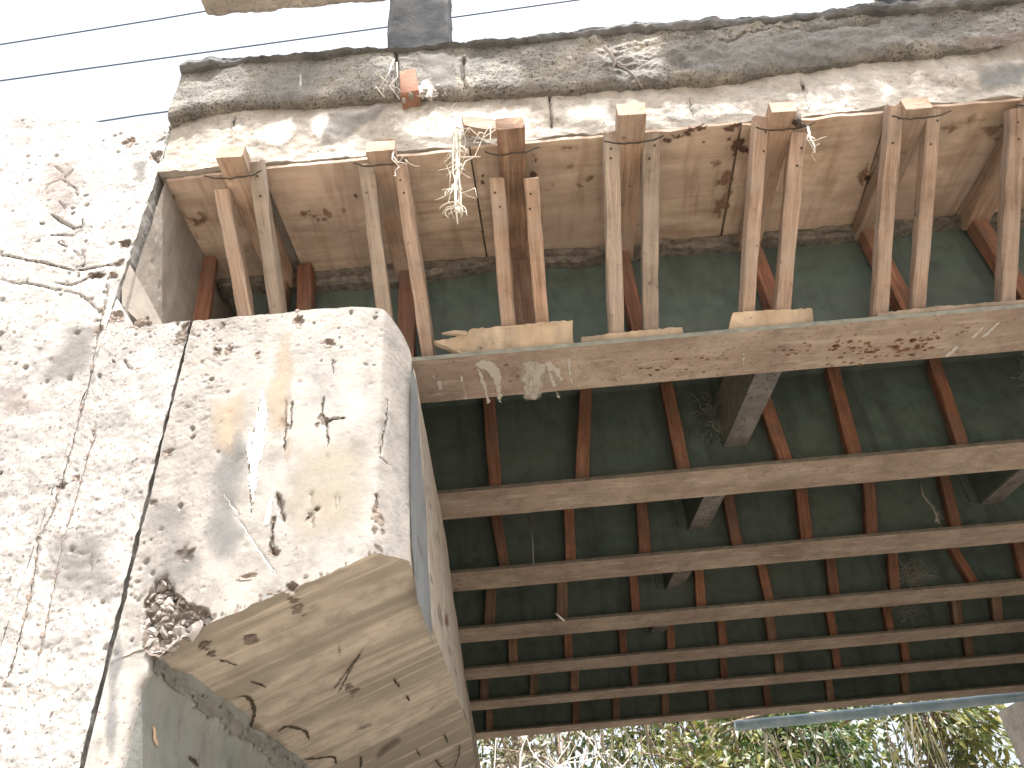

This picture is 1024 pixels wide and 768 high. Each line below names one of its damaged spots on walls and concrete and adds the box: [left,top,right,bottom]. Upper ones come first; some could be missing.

crack [0,168,115,677]
crack [248,406,286,555]
crack [380,398,388,463]
flaking render [144,579,245,660]